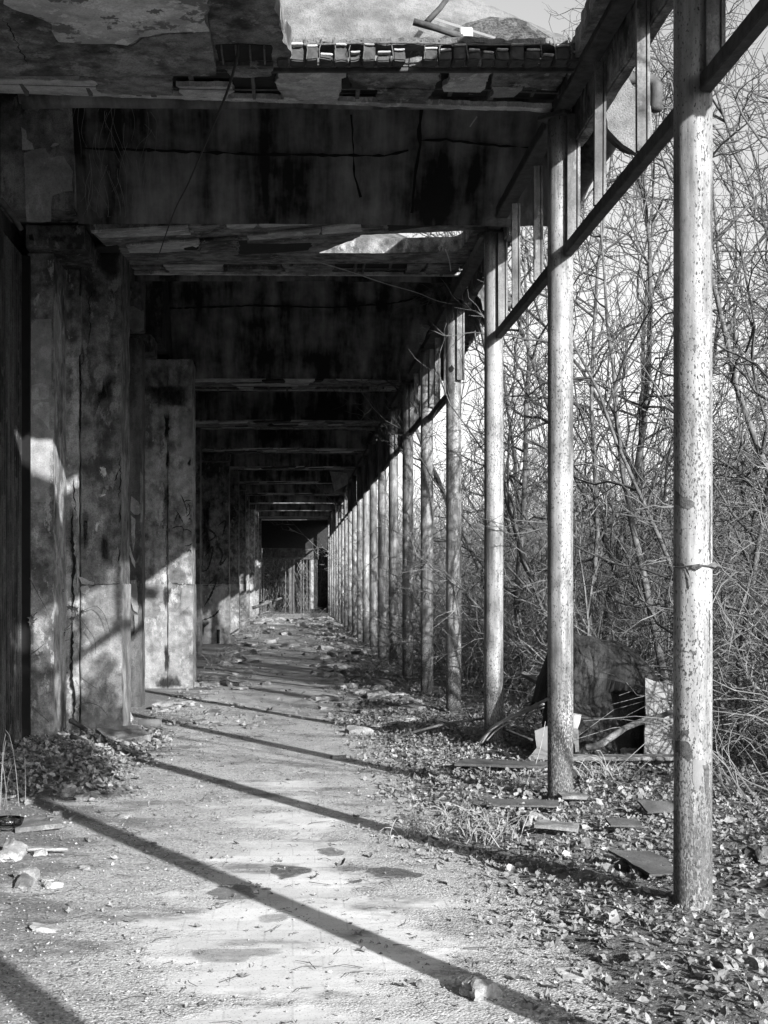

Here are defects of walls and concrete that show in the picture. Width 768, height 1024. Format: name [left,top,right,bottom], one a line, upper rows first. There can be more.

peeling [3,0,210,46]
spalling [215,43,273,62]
crack [82,110,528,213]
crack [114,453,122,523]
crack [66,481,121,719]